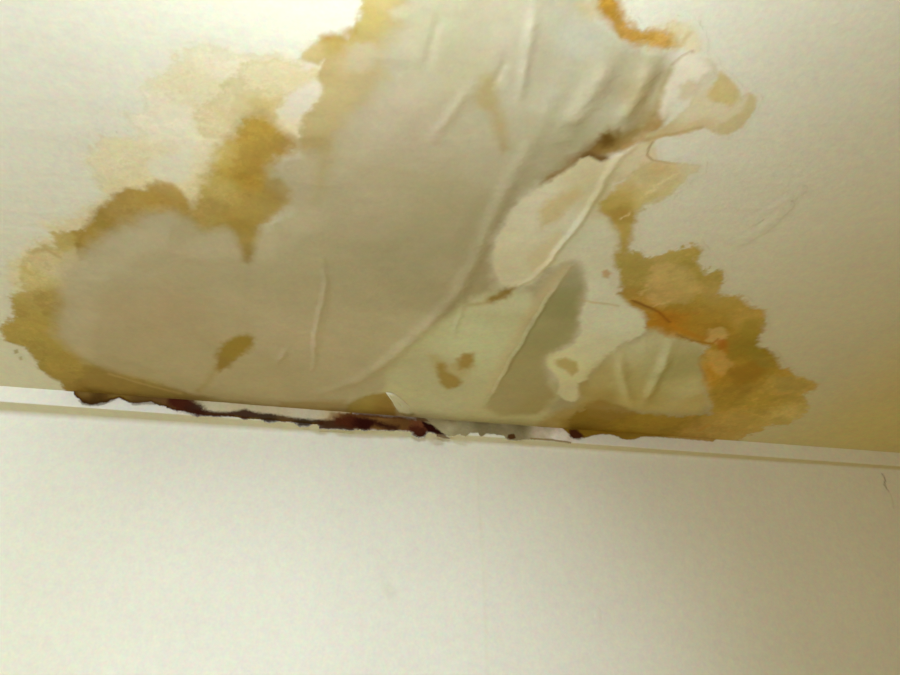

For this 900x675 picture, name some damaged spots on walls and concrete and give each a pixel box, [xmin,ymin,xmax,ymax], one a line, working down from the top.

damp [0,0,900,453]
peeling [386,392,414,416]
peeling [426,418,572,444]